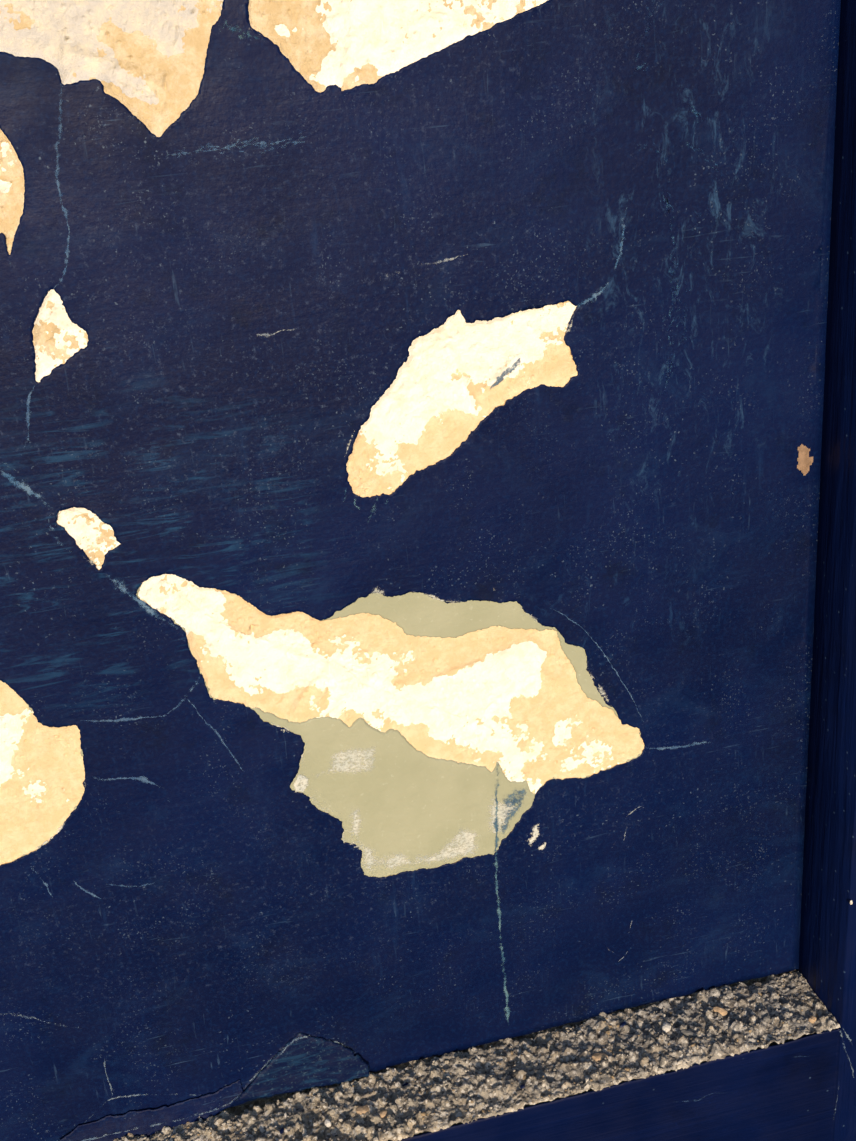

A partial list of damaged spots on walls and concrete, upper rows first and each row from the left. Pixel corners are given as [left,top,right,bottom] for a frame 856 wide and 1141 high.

peeling [0,0,224,137]
peeling [248,0,547,93]
peeling [0,130,25,255]
peeling [32,289,89,382]
peeling [346,301,577,497]
peeling [57,507,120,569]
peeling [0,680,85,865]
peeling [136,574,644,877]
crack [493,763,510,1021]